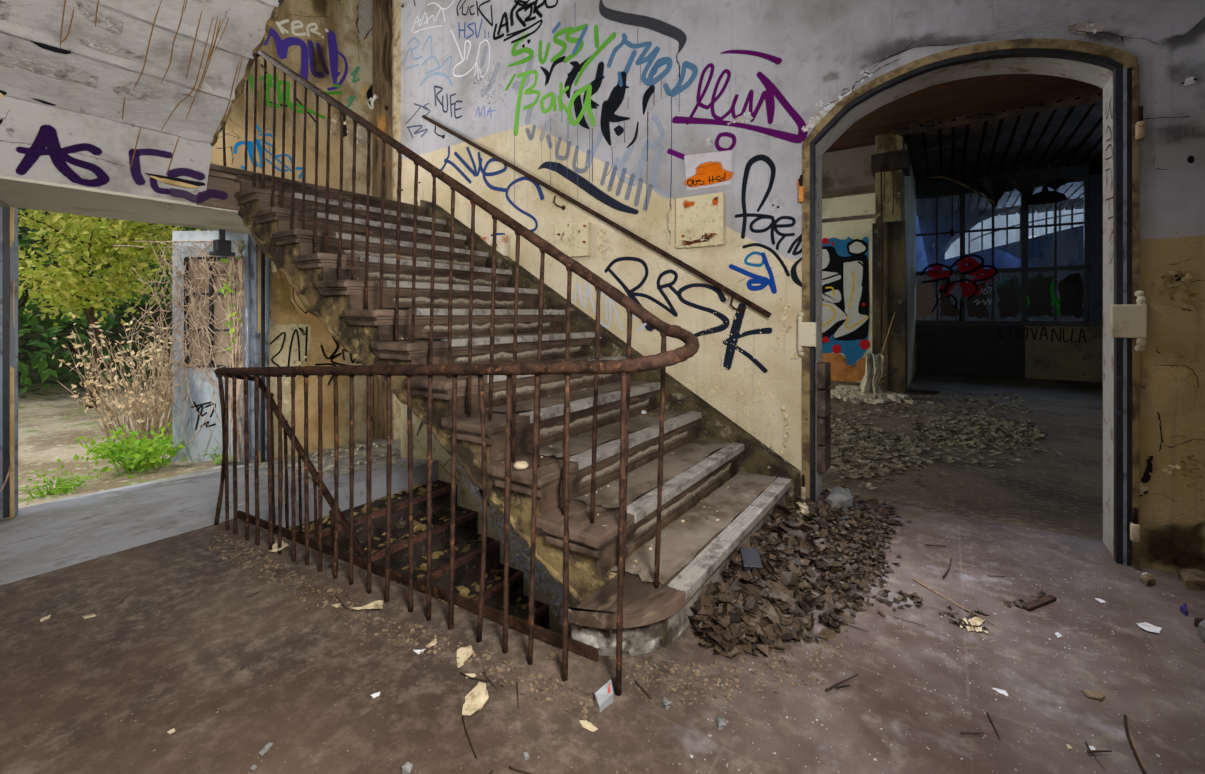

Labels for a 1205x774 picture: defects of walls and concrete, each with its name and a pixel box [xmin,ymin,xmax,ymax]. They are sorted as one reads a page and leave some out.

leakage [313,0,348,14]
leakage [313,48,328,78]
peeling [803,91,852,131]
crack [1139,349,1205,451]
leakage [1149,523,1204,565]